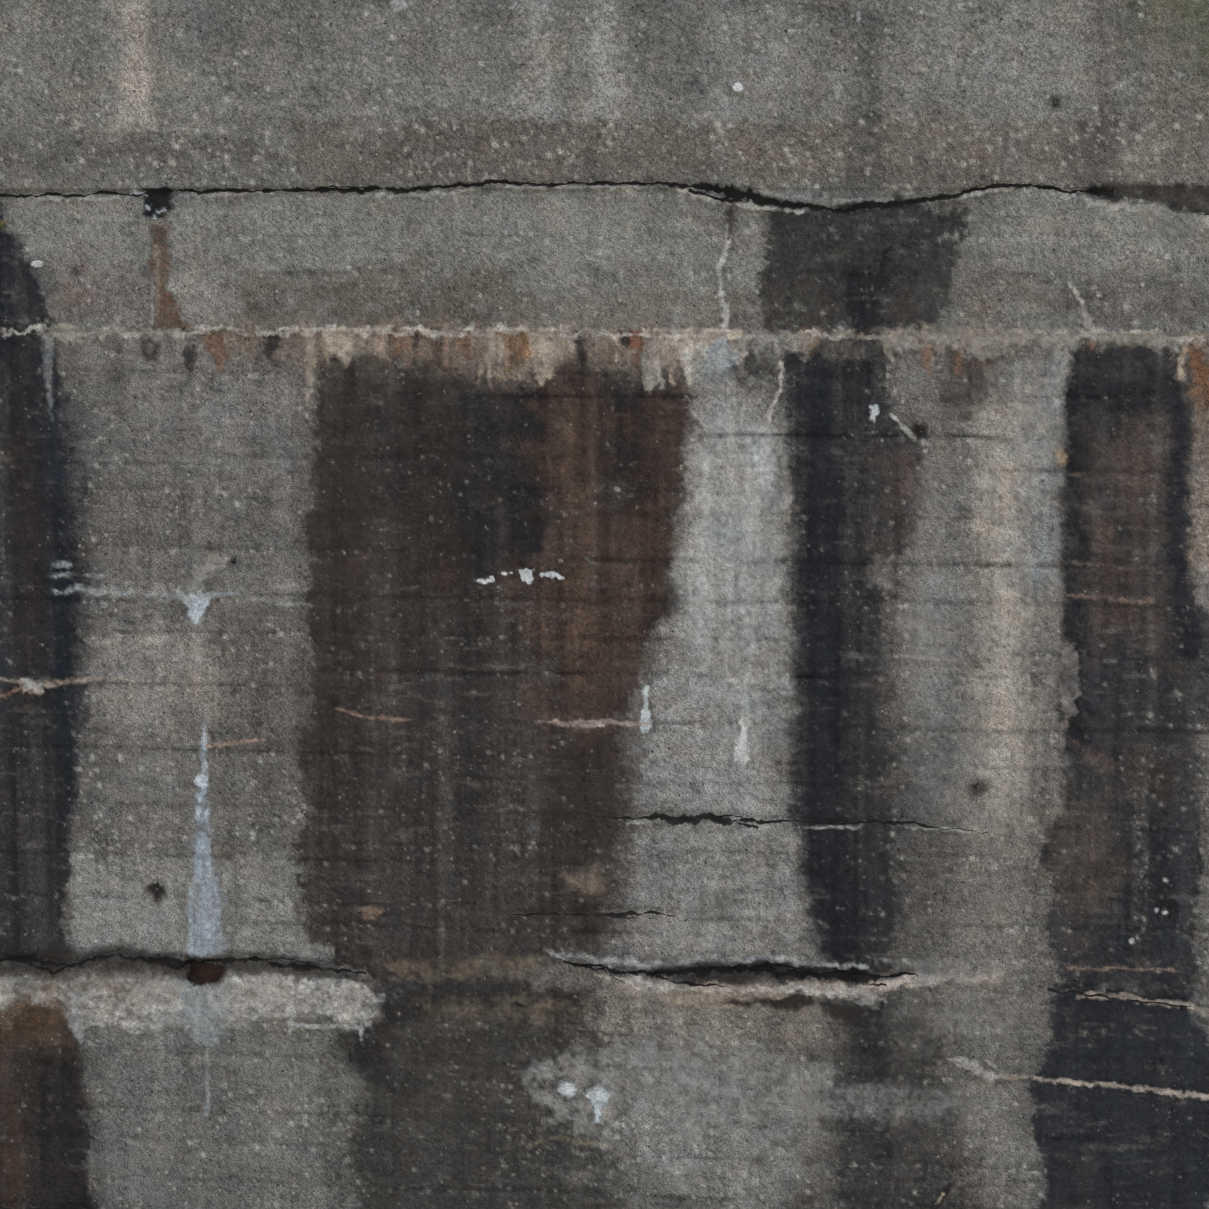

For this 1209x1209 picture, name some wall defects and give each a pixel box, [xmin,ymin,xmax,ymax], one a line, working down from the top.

crack [0,179,1114,215]
spalling [1047,182,1209,232]
rust [141,224,747,401]
water stain [255,323,651,340]
rust [1178,332,1209,416]
water stain [0,207,244,963]
water stain [660,192,1209,1209]
water stain [0,353,999,1209]
crack [0,944,366,978]
crack [563,955,919,987]